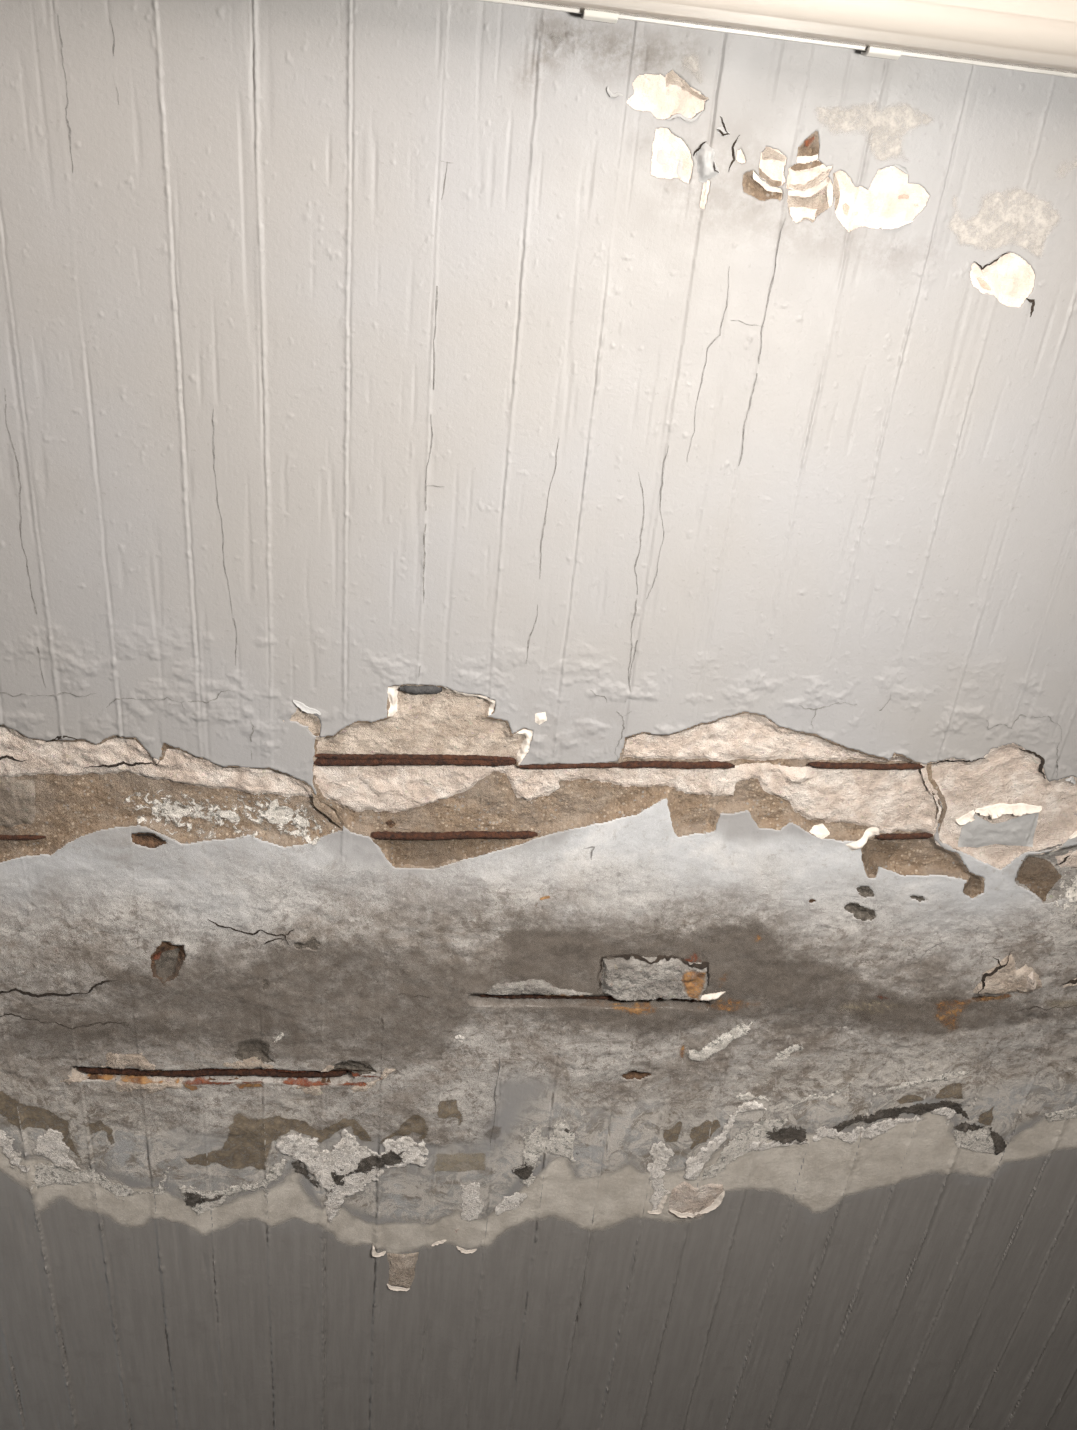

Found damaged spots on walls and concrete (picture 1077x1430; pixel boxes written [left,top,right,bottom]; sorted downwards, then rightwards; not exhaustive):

peeling [607,70,710,209]
peeling [729,131,929,232]
crack [0,388,237,708]
crack [423,286,444,603]
crack [591,218,786,762]
spalling [0,684,1077,927]
crack [0,980,127,1030]
spalling [59,1039,396,1096]
leakage [4,953,490,1062]
crack [208,919,294,945]
spalling [475,954,727,1010]
leakage [500,926,1051,1061]